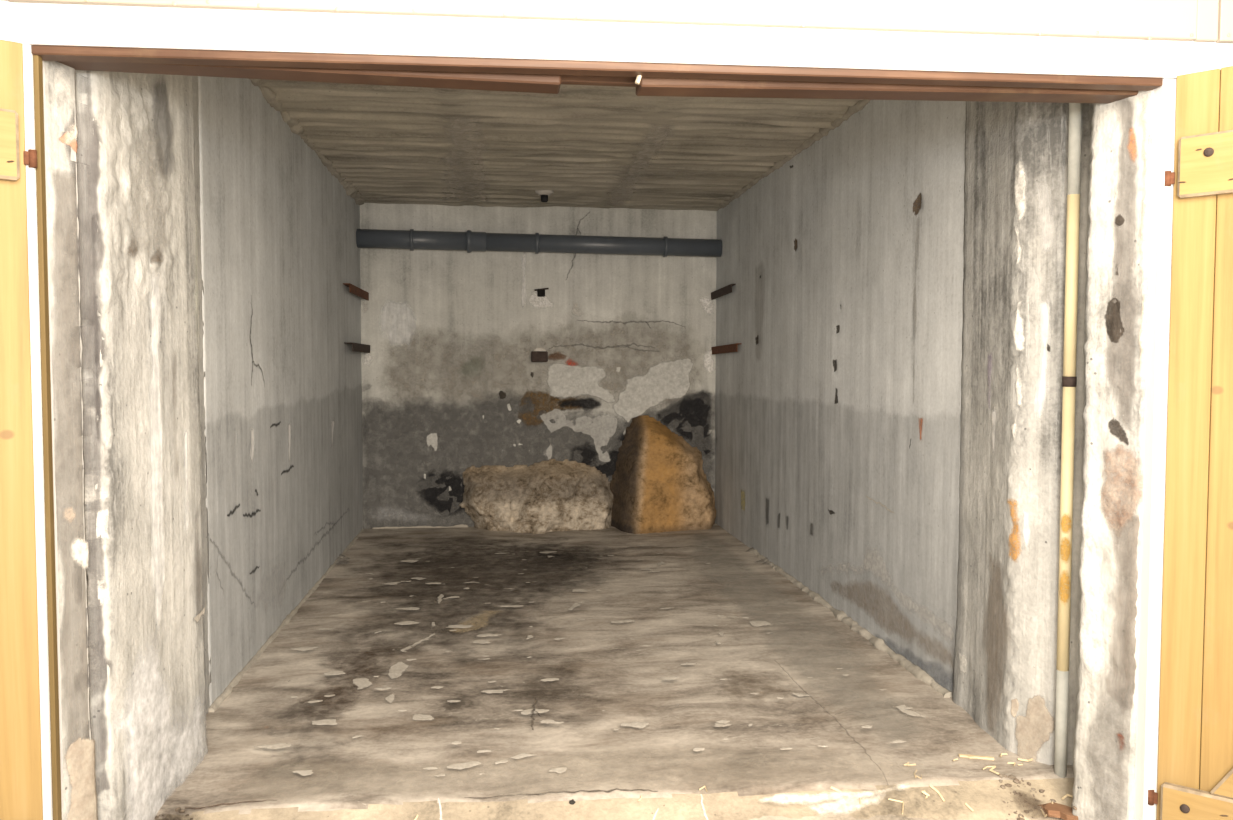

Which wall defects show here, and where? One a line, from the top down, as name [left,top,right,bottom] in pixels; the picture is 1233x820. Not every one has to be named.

water stain [155,84,172,173]
crack [250,303,265,387]
spalling [1105,298,1124,343]
water stain [362,326,715,529]
peeling [531,359,693,462]
corrosion [1008,501,1020,560]
water stain [822,550,954,690]
peeling [1011,695,1054,762]